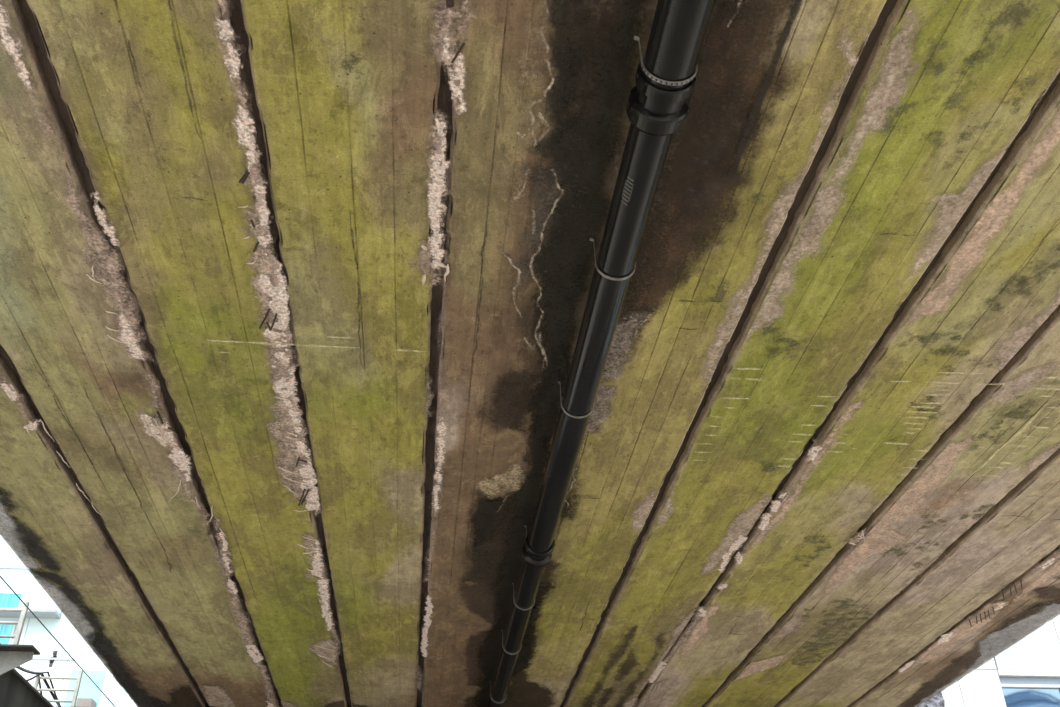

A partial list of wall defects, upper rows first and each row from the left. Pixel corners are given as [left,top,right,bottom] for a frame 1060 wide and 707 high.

spalling [432,0,474,113]
water stain [0,487,212,707]
spalling [65,178,297,707]
spalling [214,0,320,514]
spalling [420,595,434,657]
spalling [412,112,450,288]
spalling [425,370,447,580]
crack [472,221,487,374]
water stain [459,0,646,707]
water stain [582,626,665,707]
water stain [558,0,796,526]
peeling [700,401,863,591]